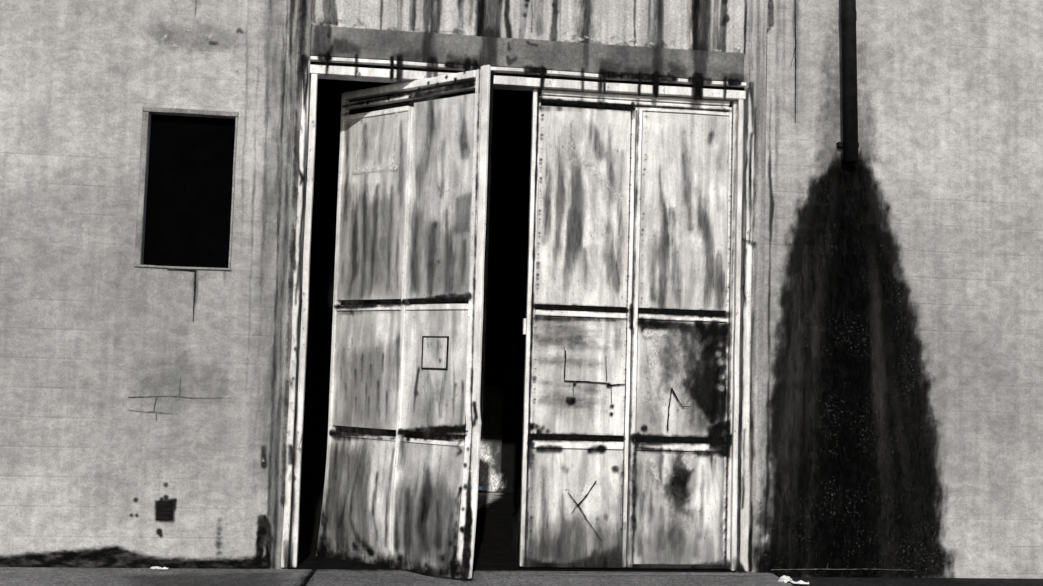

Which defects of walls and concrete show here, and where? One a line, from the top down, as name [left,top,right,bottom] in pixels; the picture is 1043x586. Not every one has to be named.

water stain [410,0,441,59]
water stain [458,0,522,72]
water stain [539,0,558,41]
water stain [581,0,592,43]
water stain [649,0,663,72]
water stain [692,0,730,85]
crack [169,269,196,320]
water stain [724,89,953,578]